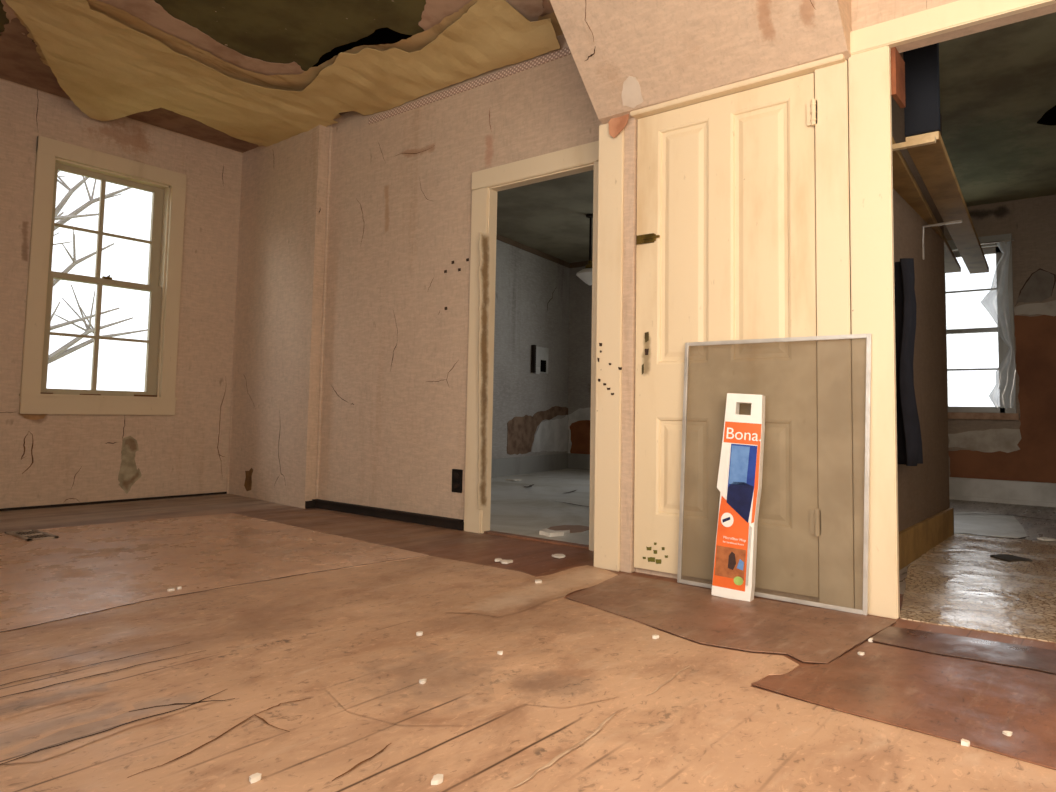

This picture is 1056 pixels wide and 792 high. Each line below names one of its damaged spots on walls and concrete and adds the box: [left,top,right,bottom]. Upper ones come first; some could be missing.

spalling [640,329,653,379]
flaking render [532,407,591,453]
flaking render [118,436,142,494]